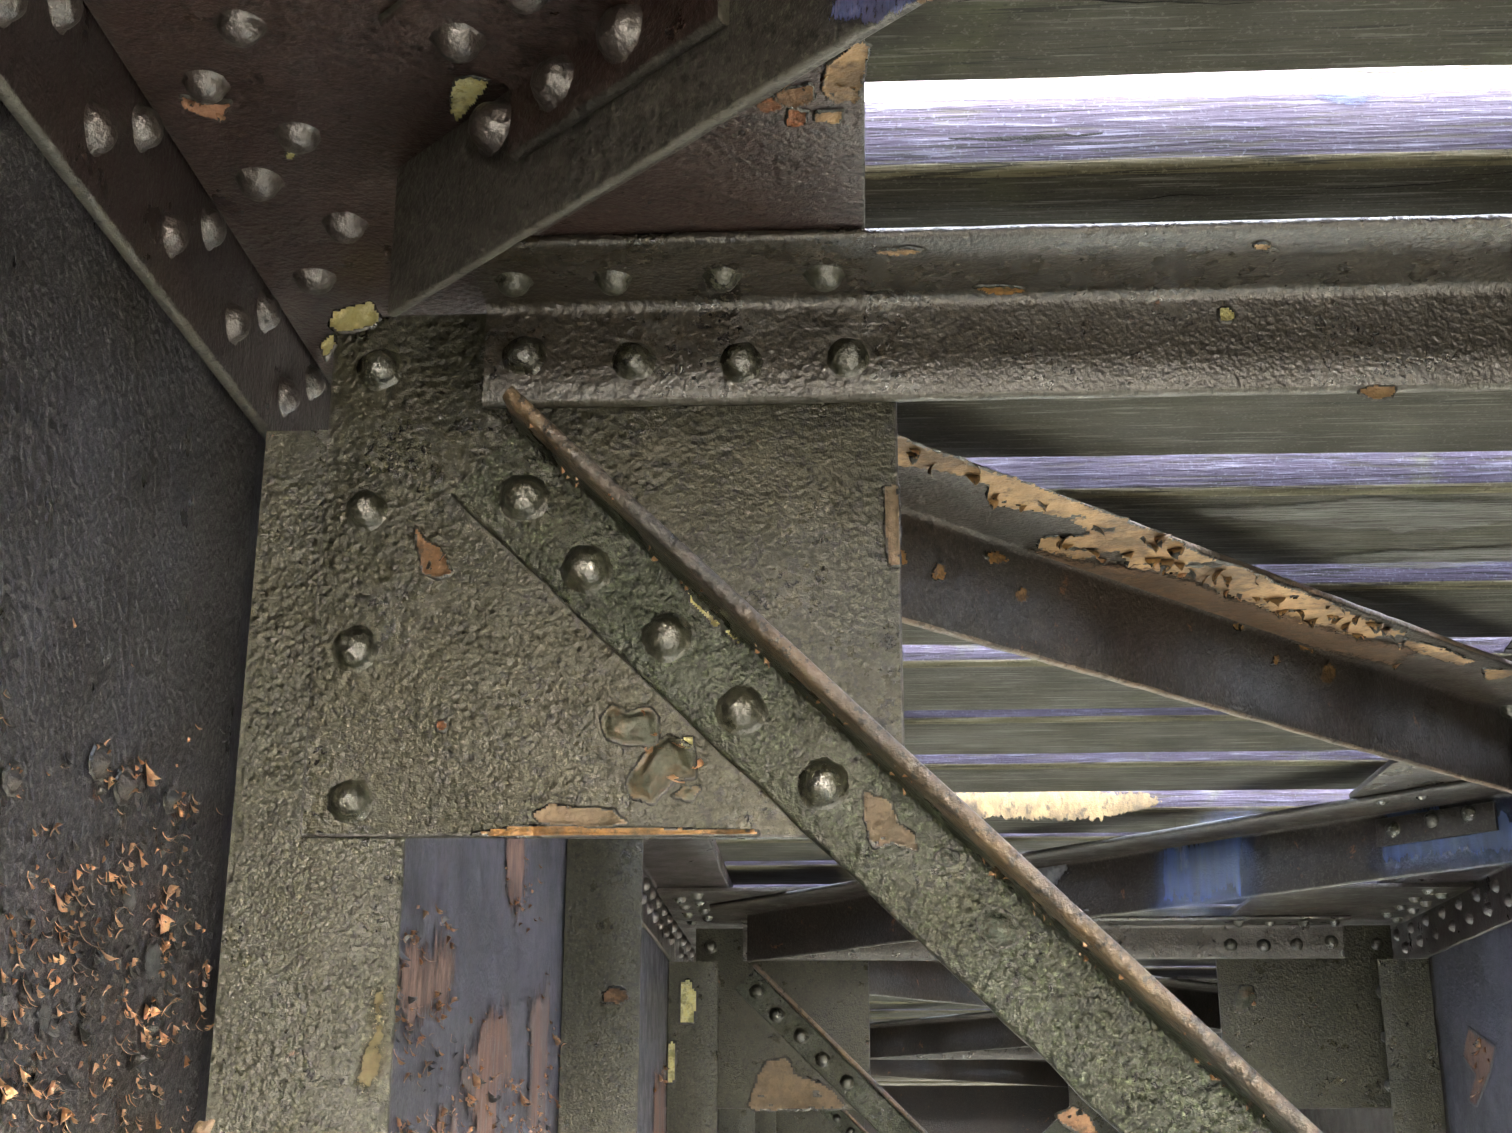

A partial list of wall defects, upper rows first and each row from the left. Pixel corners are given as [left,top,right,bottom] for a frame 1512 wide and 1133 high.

peeling [812,41,873,124]
peeling [881,434,1512,680]
peeling [505,839,544,933]
peeling [391,904,565,1133]
peeling [746,1056,846,1113]